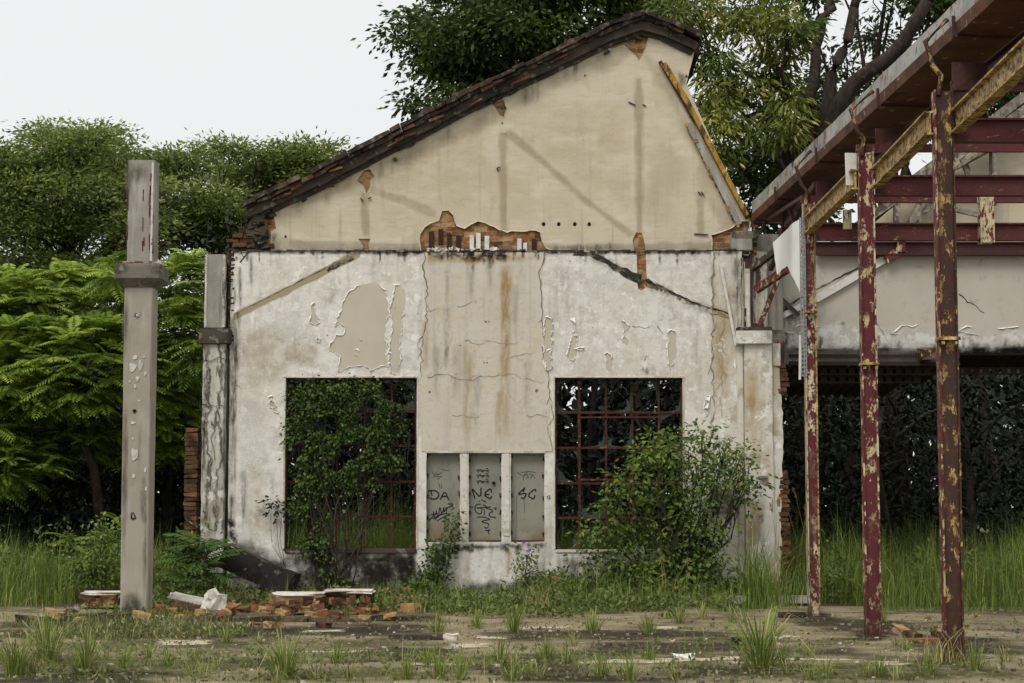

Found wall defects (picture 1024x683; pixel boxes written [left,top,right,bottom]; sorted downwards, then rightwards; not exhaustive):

flaking render [606,36,649,61]
flaking render [491,99,508,124]
flaking render [358,169,374,193]
flaking render [418,209,552,251]
flaking render [633,233,647,291]
peeling [309,282,406,375]
crack [417,246,556,450]
peeling [543,316,554,371]
peeling [566,317,586,362]
peeling [666,329,677,370]
peeling [128,355,147,424]